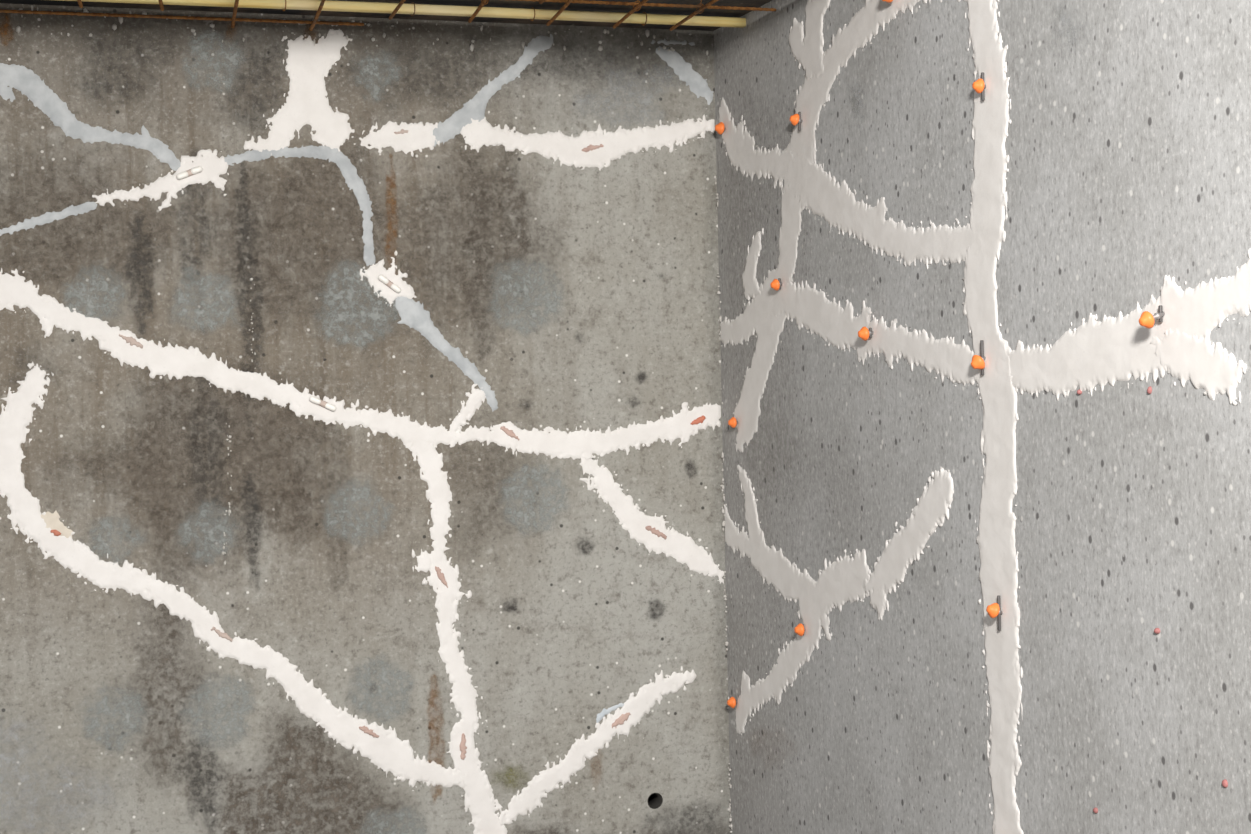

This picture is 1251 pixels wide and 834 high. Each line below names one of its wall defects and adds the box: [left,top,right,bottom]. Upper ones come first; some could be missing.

leakage [0,171,167,332]
leakage [221,155,382,348]
leakage [407,150,535,304]
leakage [84,376,317,575]
crack [0,25,724,834]
crack [354,0,1251,834]
leakage [139,604,399,834]